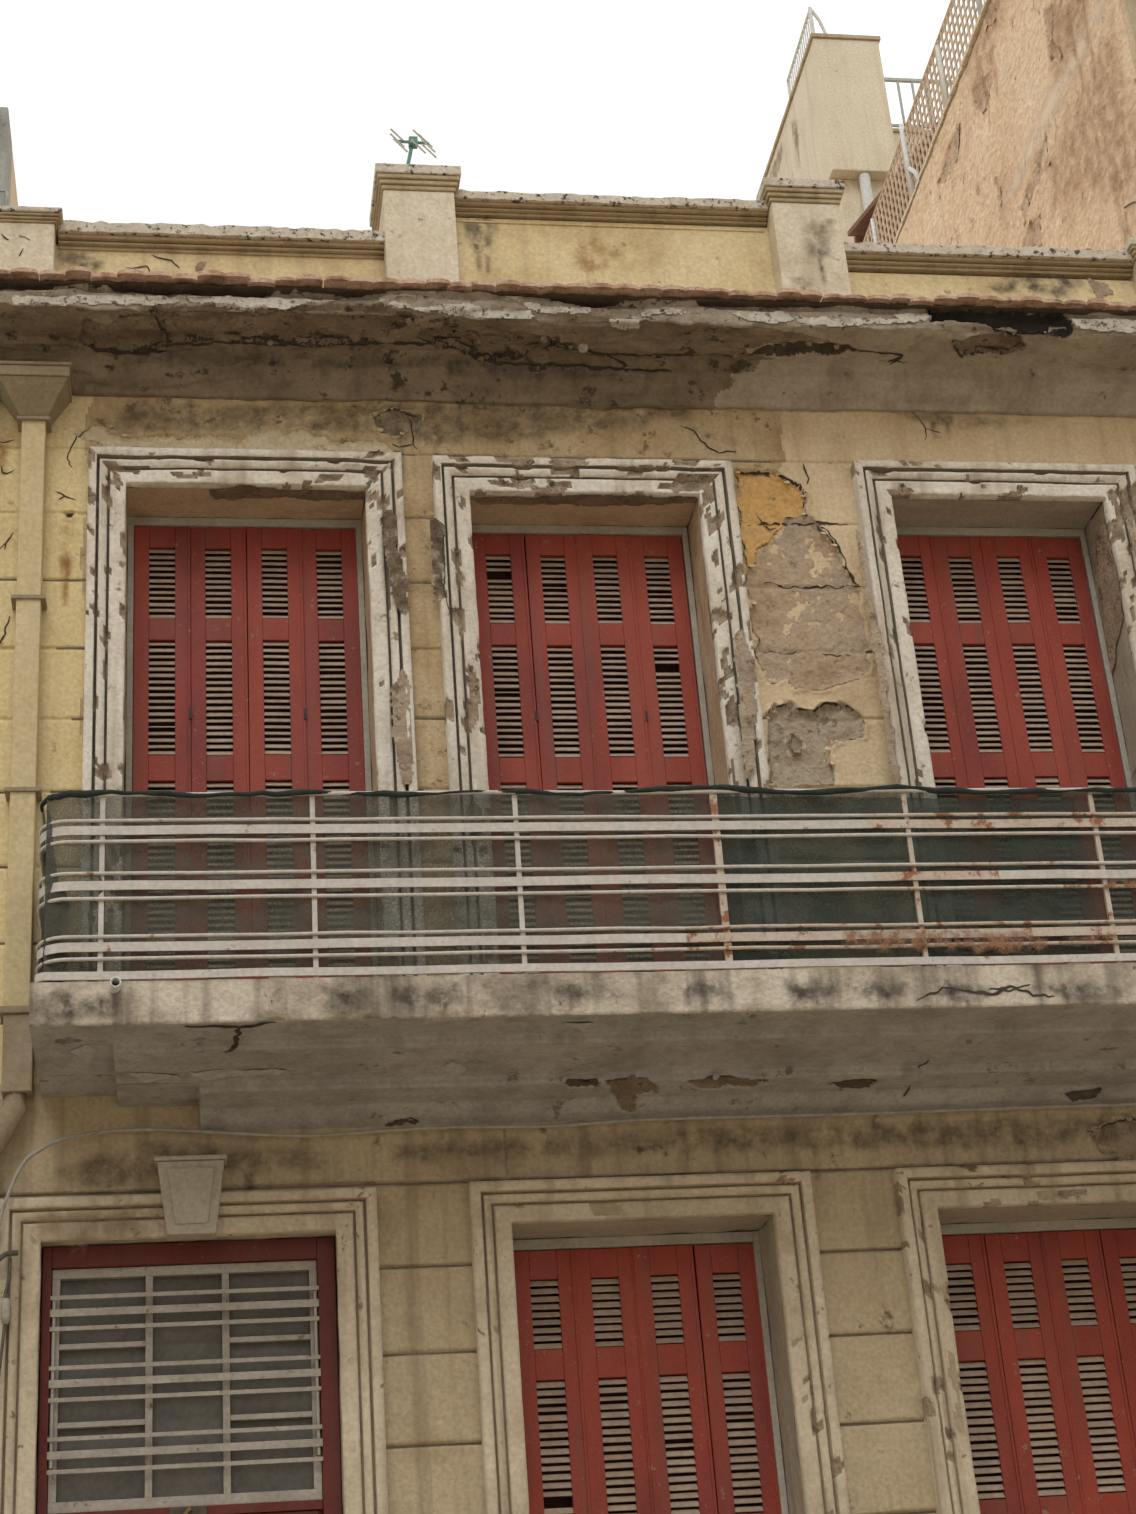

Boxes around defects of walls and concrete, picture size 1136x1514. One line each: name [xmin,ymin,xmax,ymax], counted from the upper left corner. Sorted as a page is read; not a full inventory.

leakage [1002,0,1136,211]
spalling [732,310,1136,359]
crack [95,336,732,372]
spalling [209,485,364,501]
flaking render [1091,518,1123,674]
flaking render [733,470,902,789]
peeling [390,669,414,784]
corrosion [846,928,1046,953]
leakage [790,987,824,997]
crack [916,984,1055,1001]
crack [185,1022,277,1053]
spalling [561,1075,660,1112]